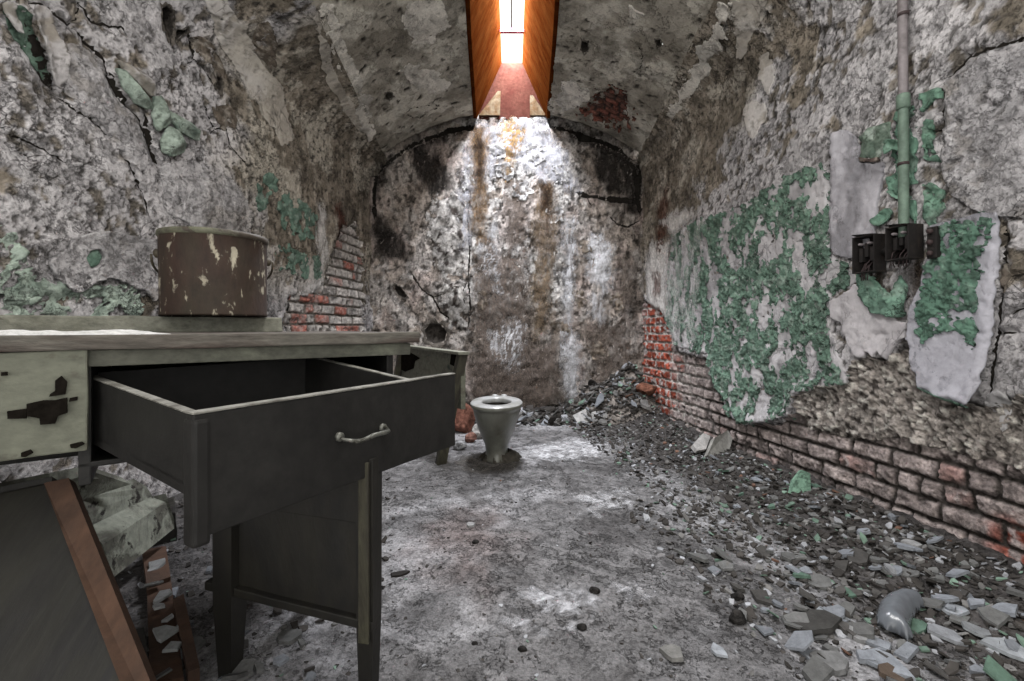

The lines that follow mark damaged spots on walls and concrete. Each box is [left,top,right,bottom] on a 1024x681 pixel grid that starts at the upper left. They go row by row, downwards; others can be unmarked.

flaking render [2,1,71,89]
crack [24,2,157,210]
peeling [115,60,201,157]
crack [936,37,1024,142]
peeling [0,225,158,316]
flaking render [255,172,367,332]
leakage [372,156,391,195]
leakage [373,215,407,260]
leakage [413,122,640,247]
leakage [471,178,695,408]
peeling [642,42,1024,564]
crack [990,229,1024,393]